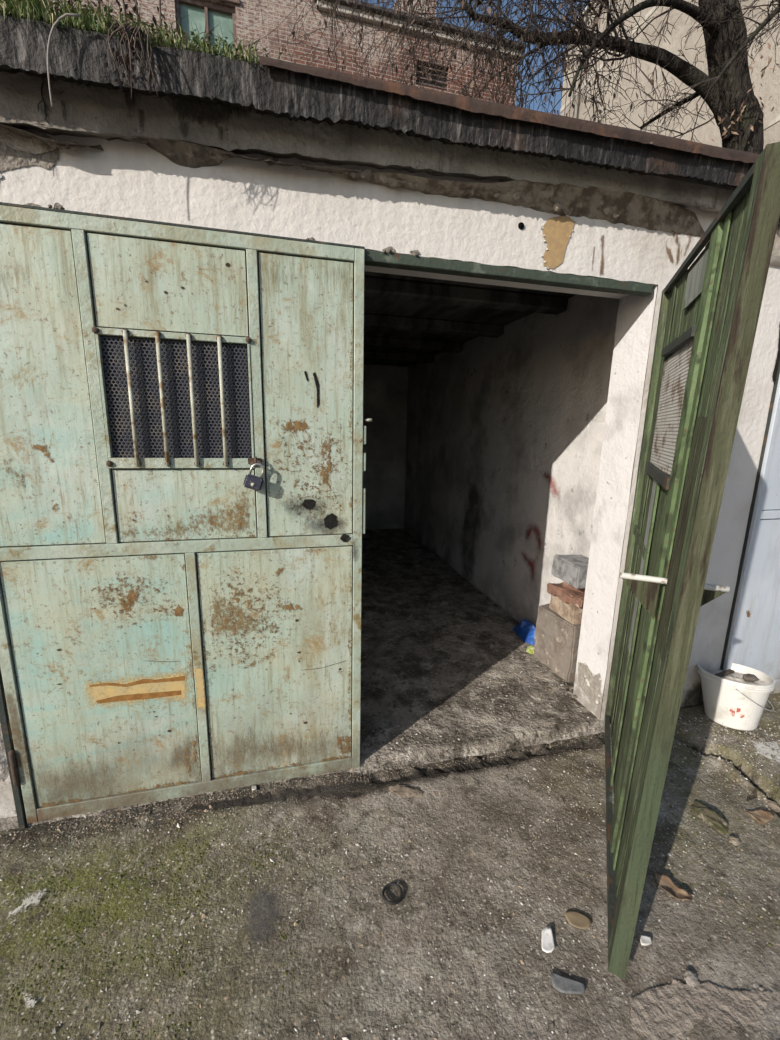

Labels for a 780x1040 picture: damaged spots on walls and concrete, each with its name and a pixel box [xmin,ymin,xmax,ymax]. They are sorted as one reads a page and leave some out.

spalling [0,124,704,269]
rust [274,410,353,518]
rust [123,492,255,542]
rust [43,732,210,807]
rust [85,567,302,708]
rust [212,734,306,778]
rust [320,671,351,762]
peeling [572,660,602,704]